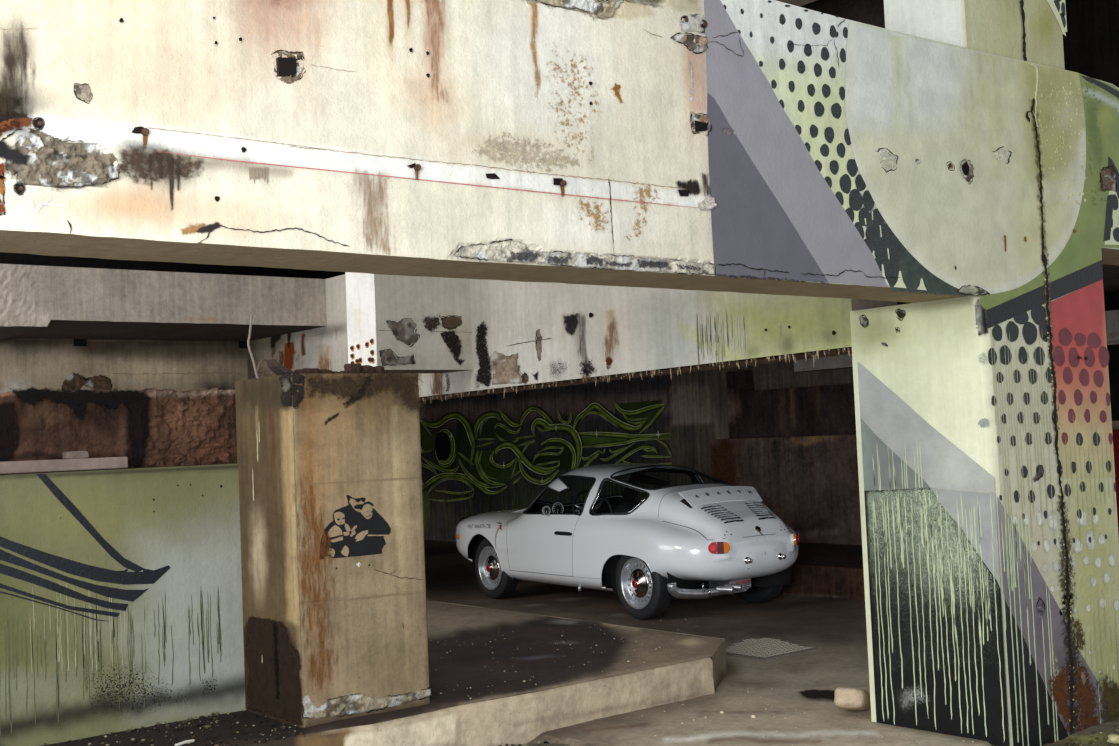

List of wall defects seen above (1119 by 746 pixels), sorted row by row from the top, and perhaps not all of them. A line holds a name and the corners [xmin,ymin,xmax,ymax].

rust [387,0,410,43]
spalling [535,0,624,18]
rust [531,2,597,149]
spalling [671,14,736,136]
spalling [0,128,121,215]
spalling [454,239,716,275]
peeling [62,373,112,391]
crack [1020,0,1083,735]
rust [297,483,334,687]
leakage [245,617,302,725]
spalling [302,687,432,719]
rust [1048,656,1101,735]